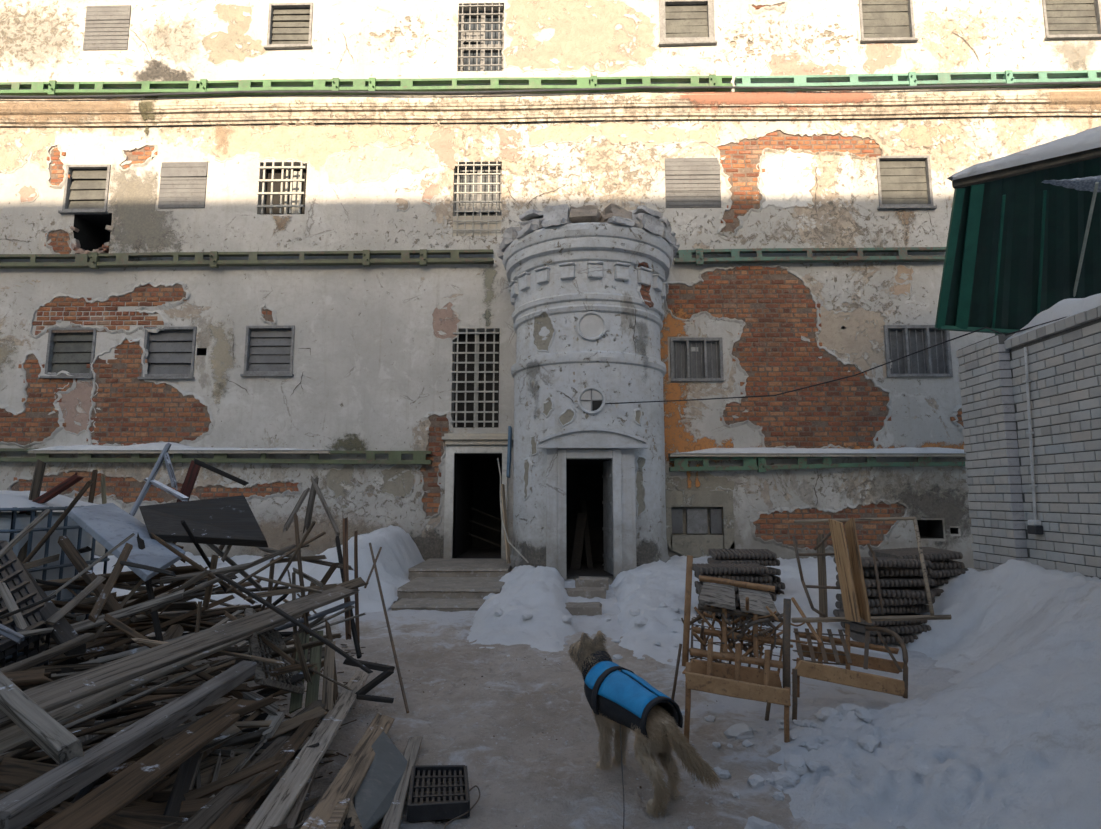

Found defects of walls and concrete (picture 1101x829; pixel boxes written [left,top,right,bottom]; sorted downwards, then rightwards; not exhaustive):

peeling [201,2,268,66]
peeling [502,0,659,75]
flaking render [117,143,158,173]
flaking render [495,119,884,237]
flaking render [44,225,115,254]
peeling [888,264,915,300]
flaking render [0,280,215,448]
peeling [520,310,579,353]
flaking render [635,260,893,454]
flaking render [8,467,303,508]
flaking render [324,411,454,519]
flaking render [750,498,909,553]